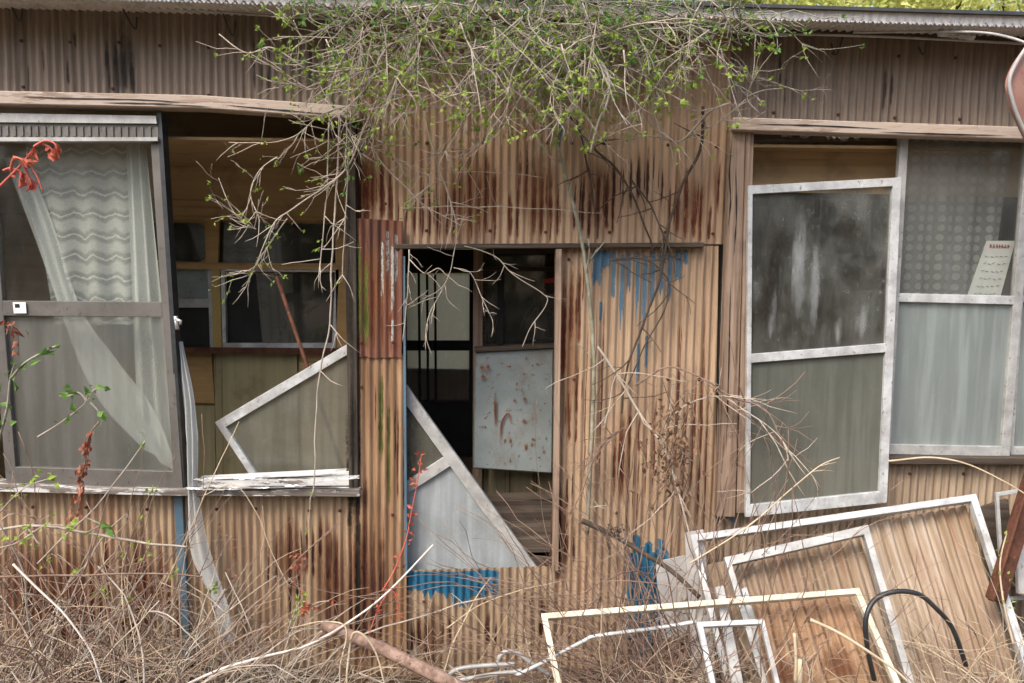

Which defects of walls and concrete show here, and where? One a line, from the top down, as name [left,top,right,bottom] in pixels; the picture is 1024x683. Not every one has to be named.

rust [358,148,560,240]
rust [573,157,726,240]
peeling [381,231,398,341]
peeling [592,250,688,384]
peeling [187,477,309,490]
rust [267,482,384,644]
rust [389,405,404,507]
peeling [406,569,499,608]
rust [550,475,575,567]
rust [561,265,656,543]
peeling [626,534,669,671]
rust [675,313,708,530]